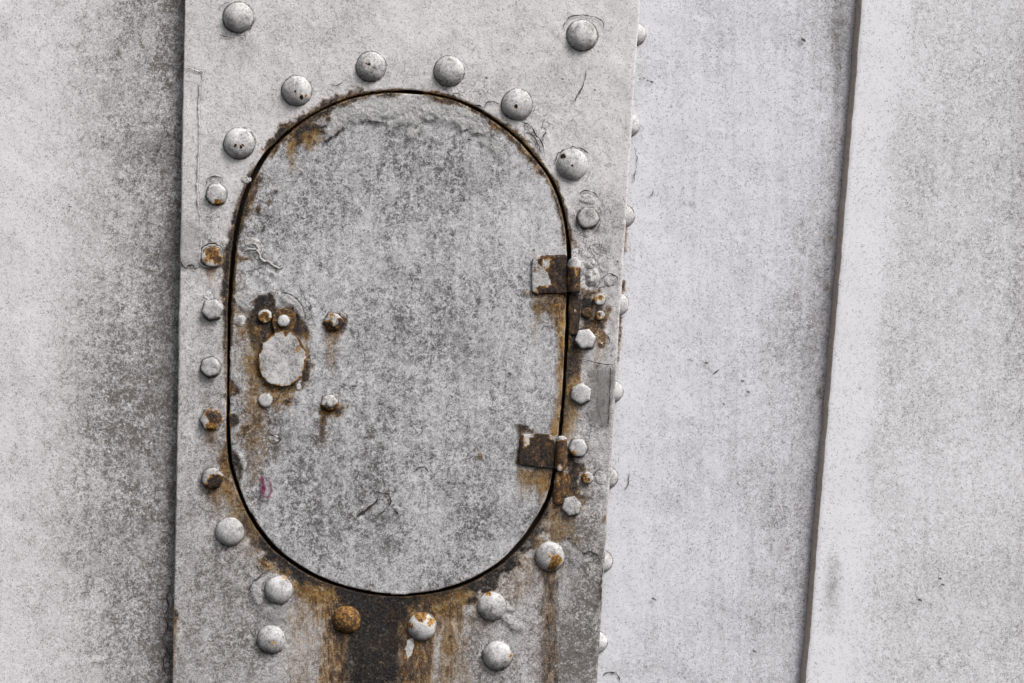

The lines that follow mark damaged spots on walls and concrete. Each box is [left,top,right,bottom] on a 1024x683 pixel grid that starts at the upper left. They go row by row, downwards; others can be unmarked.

corrosion [262,87,400,158]
corrosion [206,168,587,683]
corrosion [524,288,623,437]